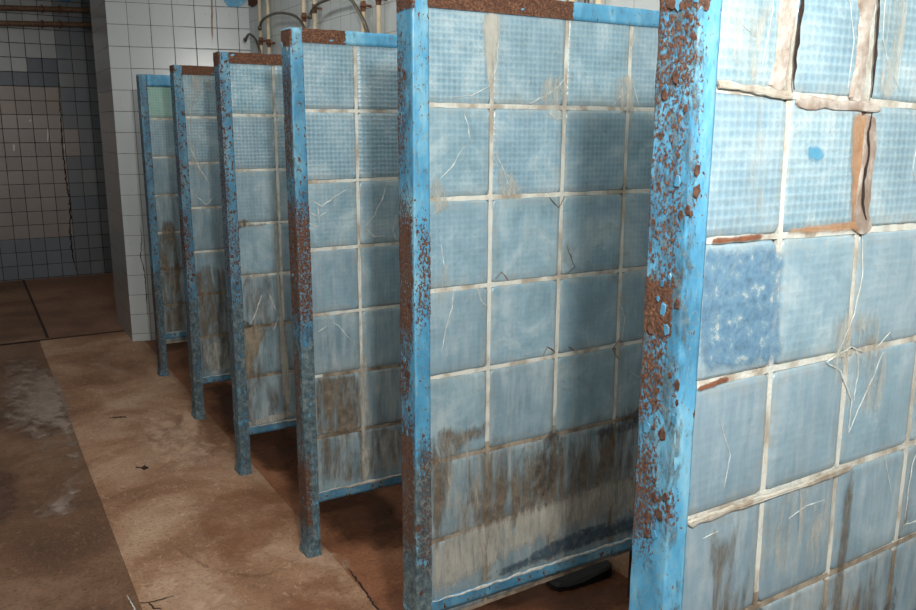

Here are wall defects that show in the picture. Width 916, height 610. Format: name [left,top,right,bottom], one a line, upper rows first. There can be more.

rust [427,0,574,20]
crack [734,0,774,72]
crack [793,0,804,90]
crack [58,85,77,271]
crack [826,0,901,431]
rust [169,28,346,536]
rust [396,0,432,596]
rust [607,0,711,577]
water stain [5,360,74,443]
water stain [432,538,632,602]
water stain [435,474,636,587]
water stain [491,568,629,610]